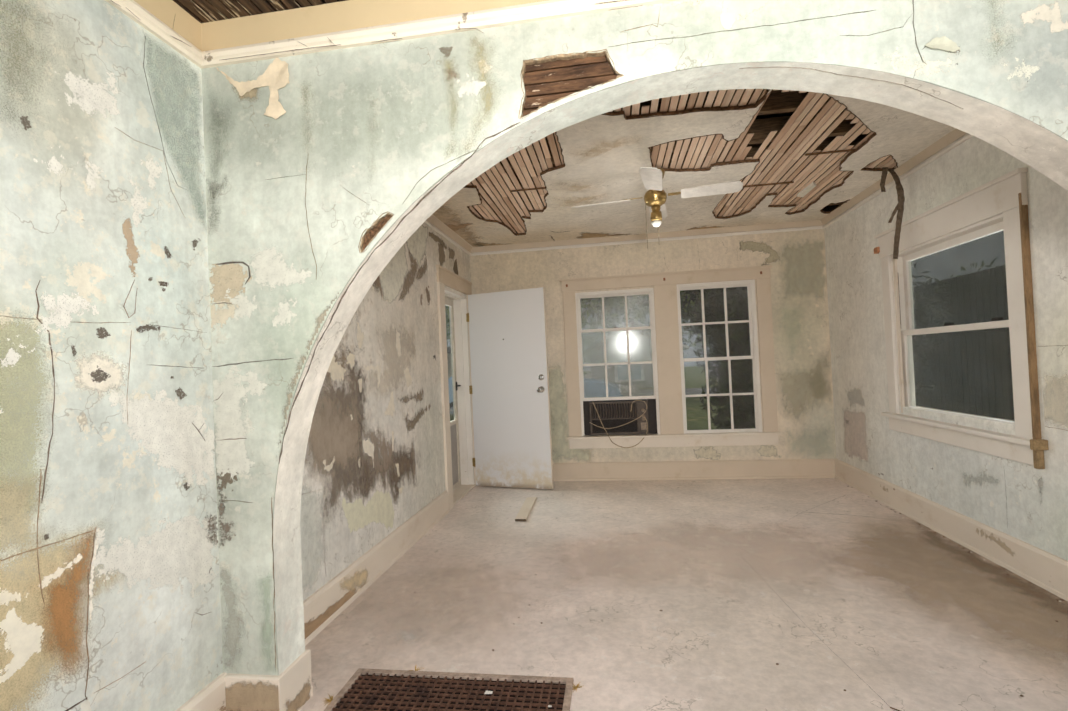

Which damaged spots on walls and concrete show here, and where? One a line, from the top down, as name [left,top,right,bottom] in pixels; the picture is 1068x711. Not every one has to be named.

peeling [217,57,290,120]
spalling [463,131,565,236]
spalling [518,49,624,119]
spalling [601,89,773,180]
spalling [712,93,898,219]
damp [399,232,458,305]
crack [0,281,145,711]
damp [300,317,430,588]